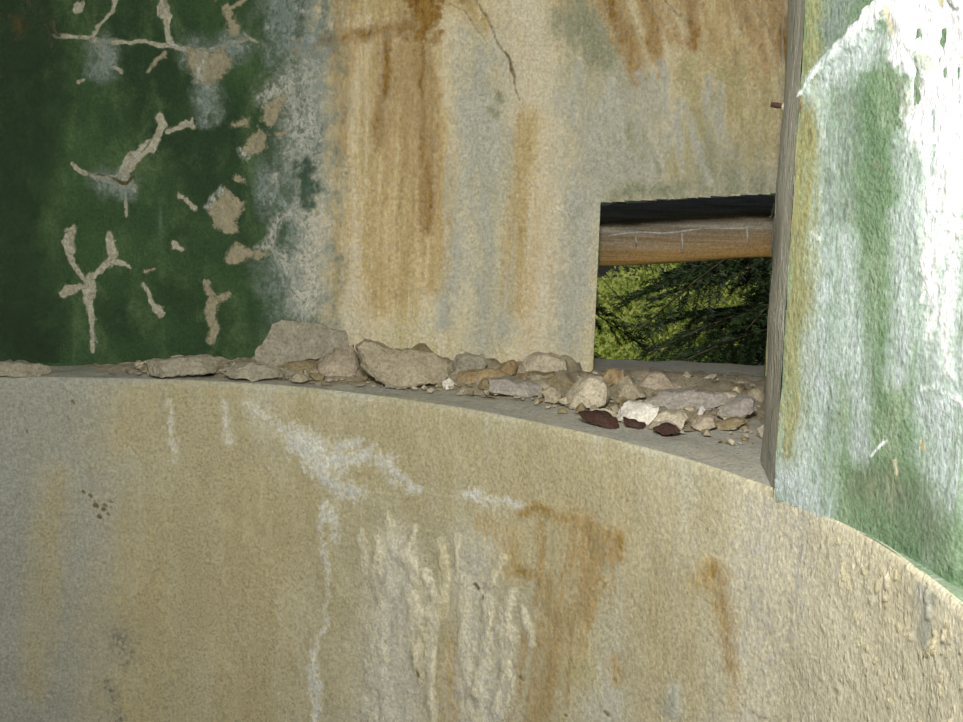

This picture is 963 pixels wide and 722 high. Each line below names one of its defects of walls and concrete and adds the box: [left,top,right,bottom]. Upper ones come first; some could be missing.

peeling [59,225,131,353]
peeling [46,0,258,217]
peeling [203,279,231,345]
peeling [177,175,270,265]
leakage [255,0,342,325]
corrosion [314,0,489,316]
crack [463,1,517,94]
corrosion [598,0,788,85]
leakage [728,0,963,722]
leakage [248,404,423,722]
corrosion [477,502,624,722]
corrosion [694,557,738,713]